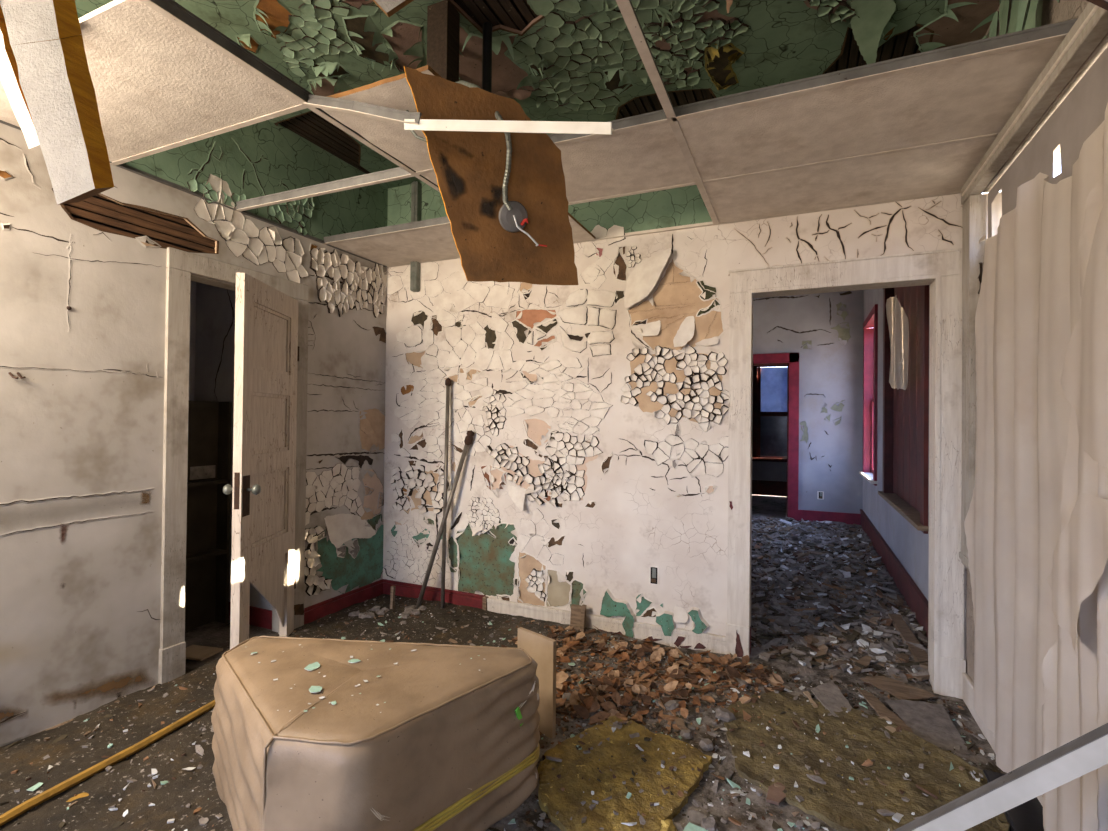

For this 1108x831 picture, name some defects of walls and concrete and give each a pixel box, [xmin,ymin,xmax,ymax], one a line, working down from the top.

peeling [235,0,425,97]
peeling [449,0,749,120]
crack [0,136,42,190]
flaking render [274,110,371,174]
crack [0,211,162,333]
crack [671,234,730,277]
crack [733,199,963,267]
crack [0,363,163,379]
peeling [60,174,729,615]
peeling [600,588,709,649]